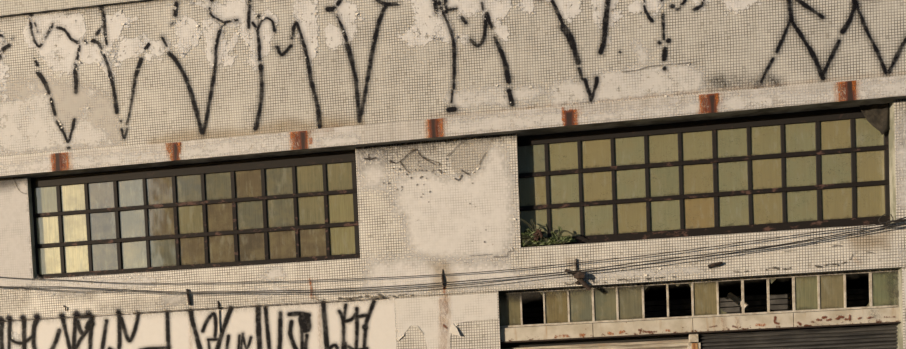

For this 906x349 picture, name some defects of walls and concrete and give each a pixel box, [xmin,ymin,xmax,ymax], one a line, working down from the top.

peeling [722,0,762,16]
rust [838,80,856,101]
rust [699,93,719,114]
rust [562,107,578,126]
rust [427,118,443,138]
rust [290,130,312,150]
rust [51,152,69,171]
rust [166,142,181,161]
crack [389,144,460,173]
peeling [0,0,702,349]